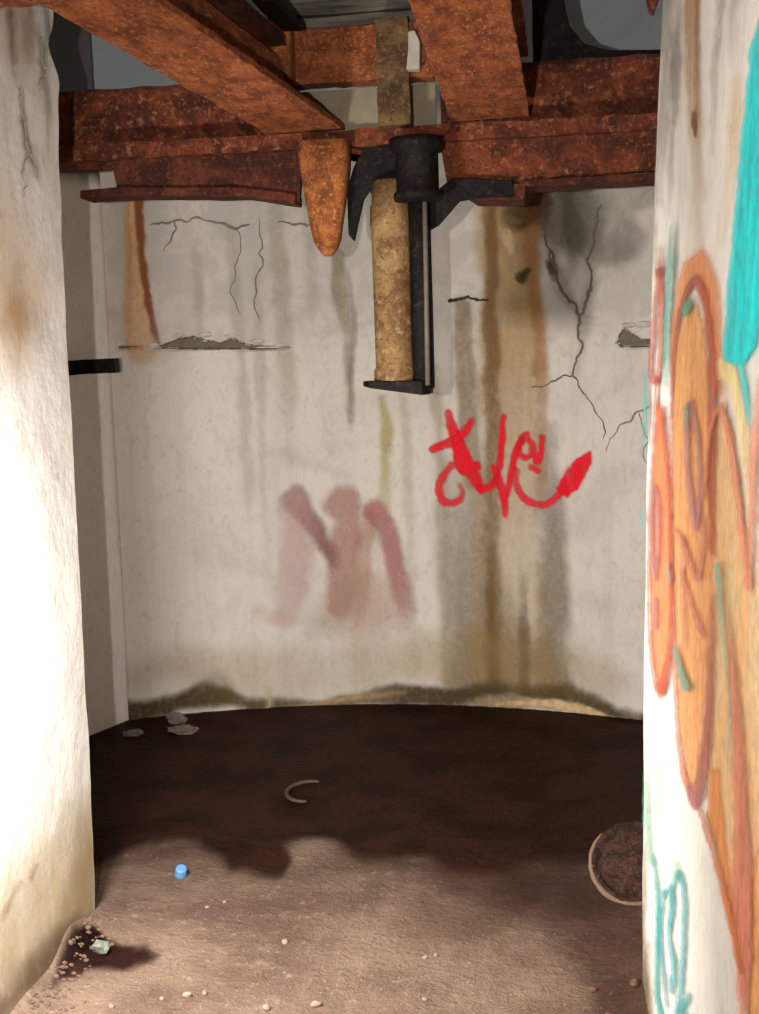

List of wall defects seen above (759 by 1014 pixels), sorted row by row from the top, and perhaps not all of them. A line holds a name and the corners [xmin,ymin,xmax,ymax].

corrosion [685,0,698,72]
corrosion [128,200,157,353]
crack [149,216,310,319]
corrosion [480,184,556,429]
water stain [544,189,601,247]
crack [530,204,649,463]